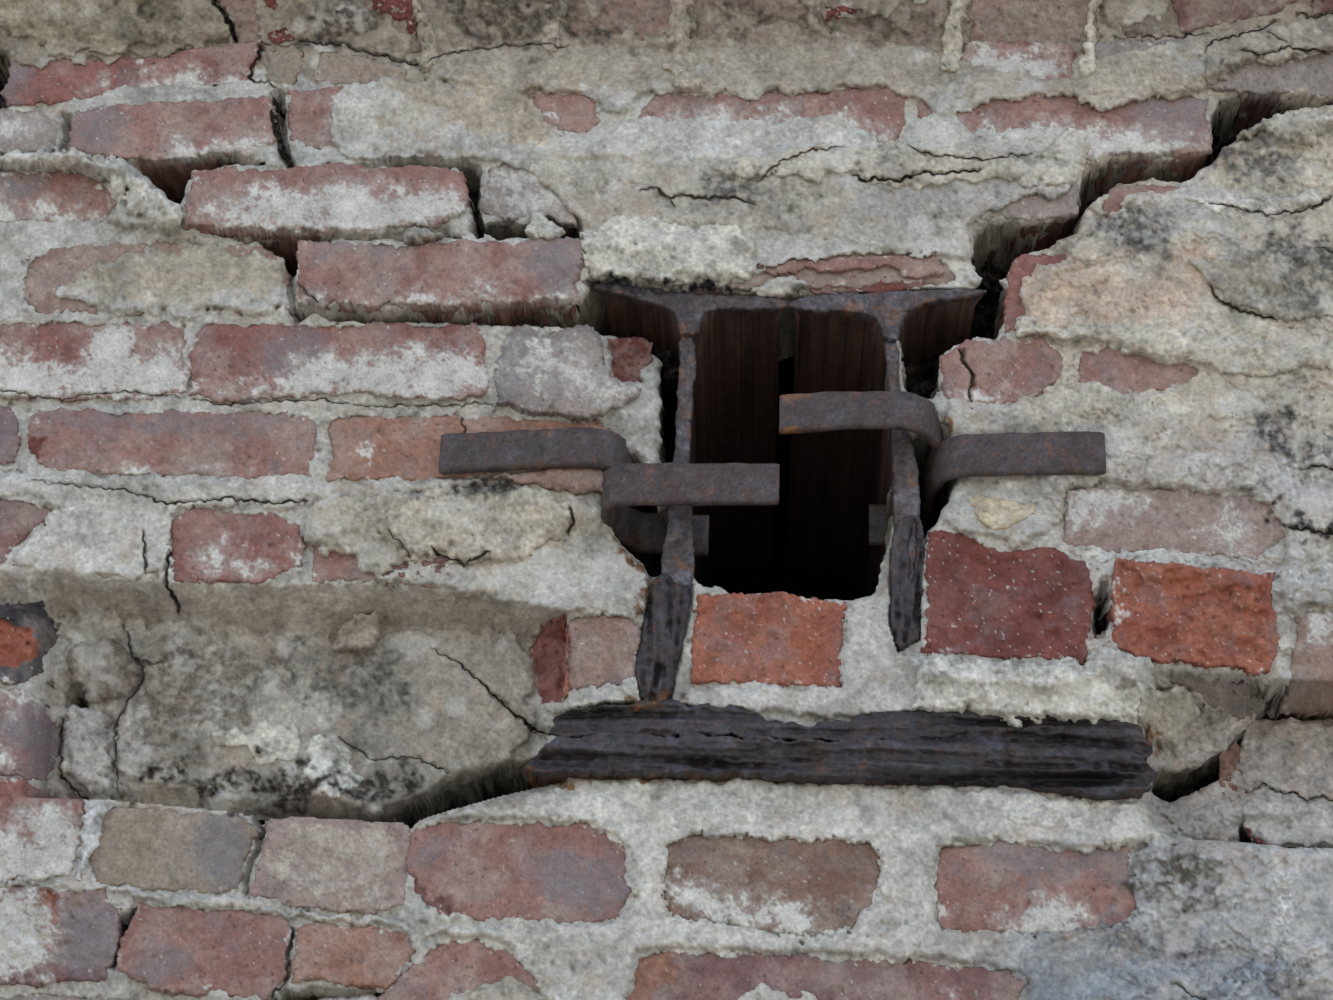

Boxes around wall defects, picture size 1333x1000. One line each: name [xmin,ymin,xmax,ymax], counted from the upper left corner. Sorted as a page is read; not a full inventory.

crack [212,0,293,167]
crack [1129,12,1333,56]
peeling [1204,15,1333,85]
crack [641,145,1030,206]
crack [1206,133,1236,167]
peeling [1185,188,1322,221]
crack [976,261,1012,300]
peeling [1038,244,1333,401]
rust [614,537,656,613]
spalling [0,601,58,685]
peeling [211,719,364,800]
crack [1158,776,1333,803]